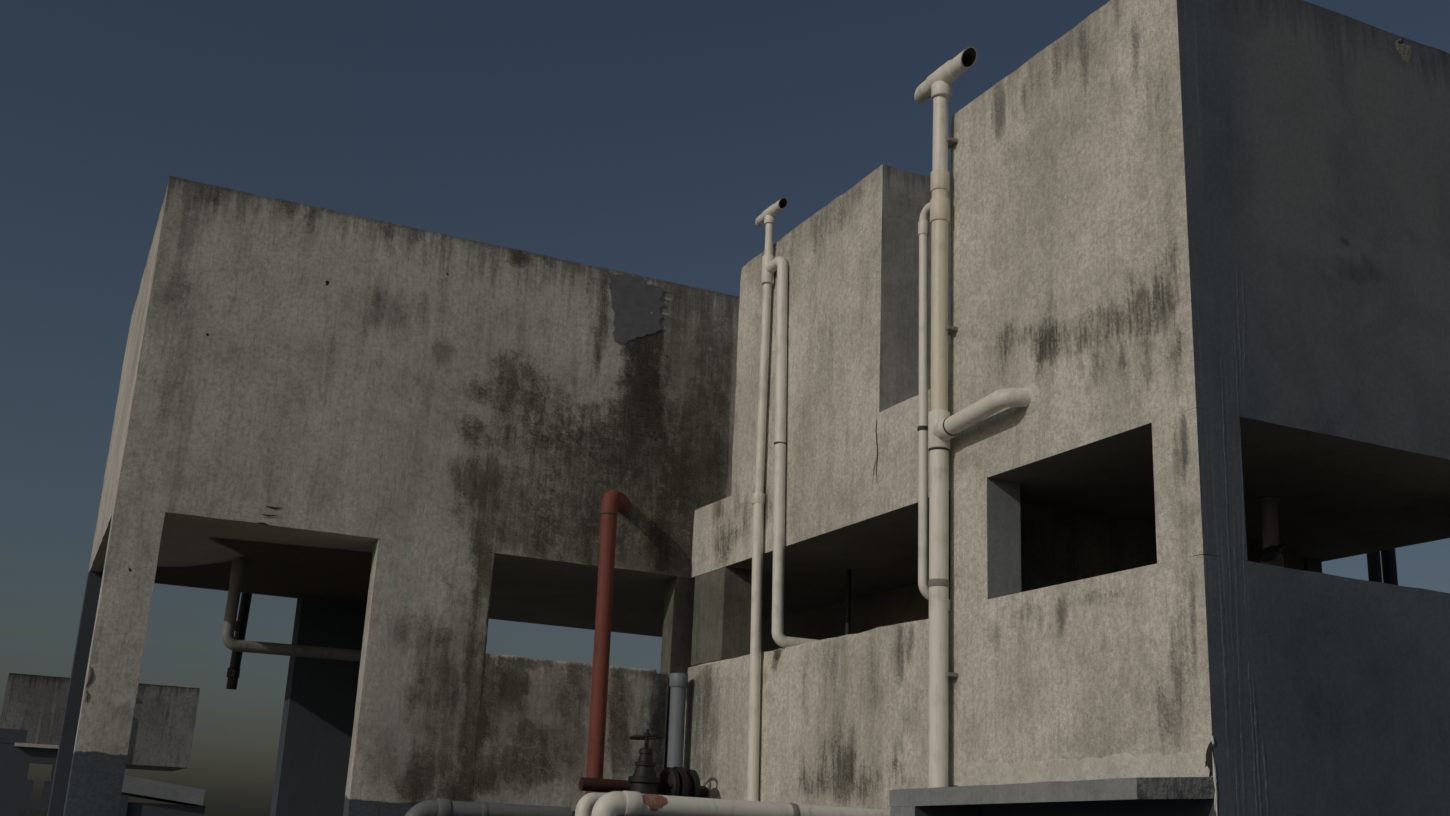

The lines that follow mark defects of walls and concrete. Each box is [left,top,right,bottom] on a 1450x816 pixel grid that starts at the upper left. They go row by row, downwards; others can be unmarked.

leakage [1001,280,1180,375]
leakage [473,332,771,575]
leakage [396,459,575,804]